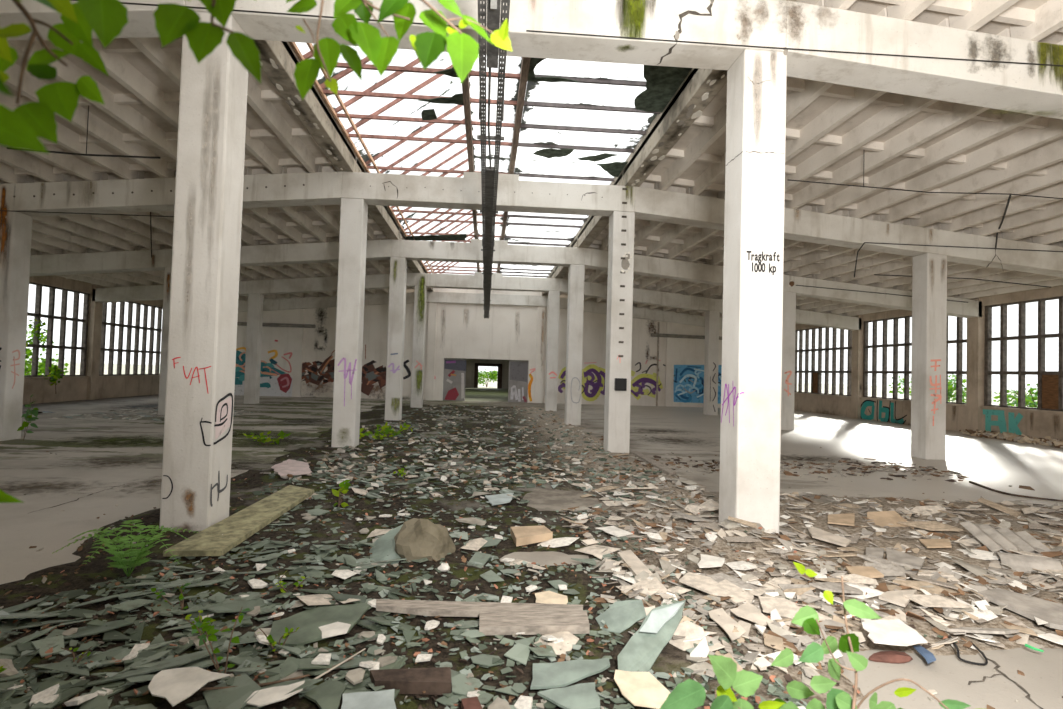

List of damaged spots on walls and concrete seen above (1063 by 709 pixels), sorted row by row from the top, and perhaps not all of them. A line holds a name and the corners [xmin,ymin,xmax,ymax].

water stain [617,0,655,40]
crack [657,0,714,65]
water stain [992,43,1006,66]
water stain [1029,42,1063,82]
rust [0,187,8,255]
crack [968,652,1043,709]